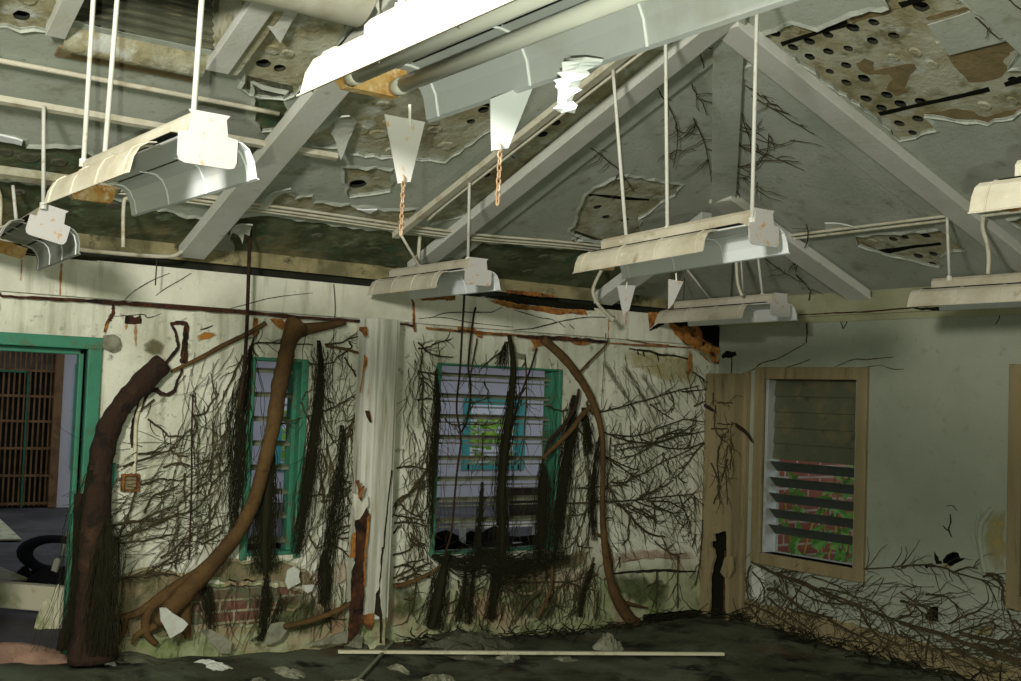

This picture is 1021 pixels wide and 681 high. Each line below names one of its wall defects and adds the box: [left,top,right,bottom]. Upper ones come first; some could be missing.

peeling [331,115,357,159]
spalling [648,312,737,364]
spalling [347,480,374,643]